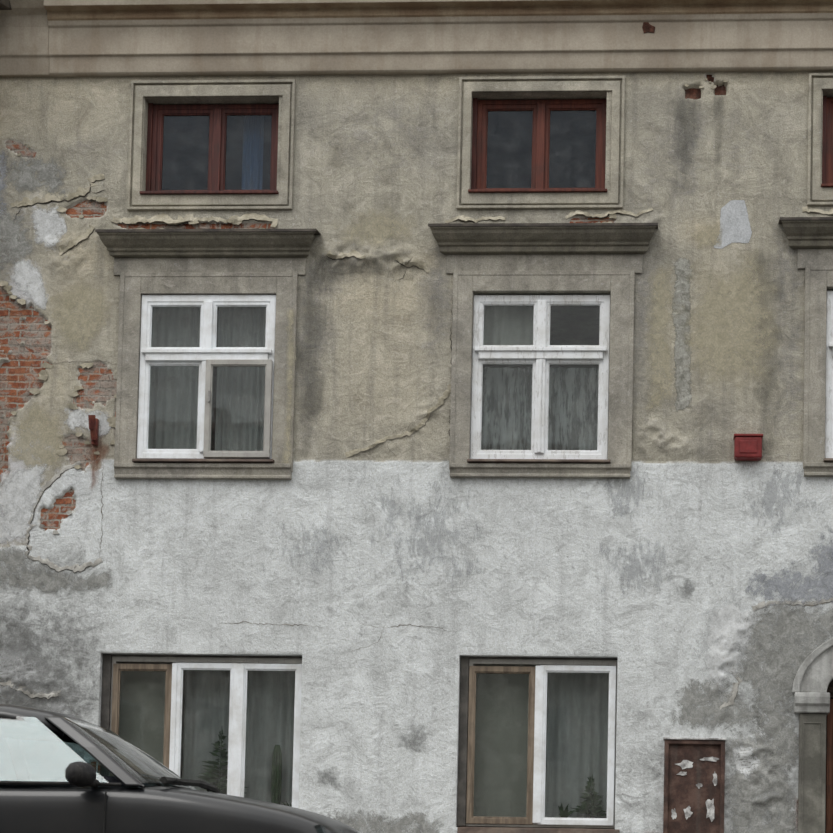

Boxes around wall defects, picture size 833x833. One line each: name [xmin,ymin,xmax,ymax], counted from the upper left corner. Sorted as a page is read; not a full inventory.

flaking render [684,75,727,99]
crack [11,174,105,221]
flaking render [111,218,278,229]
flaking render [570,214,617,223]
flaking render [714,200,752,249]
flaking render [0,196,117,593]
crack [345,384,451,458]
crack [23,461,104,573]
water stain [747,530,833,607]
crack [752,597,833,622]
flaking render [333,810,442,833]